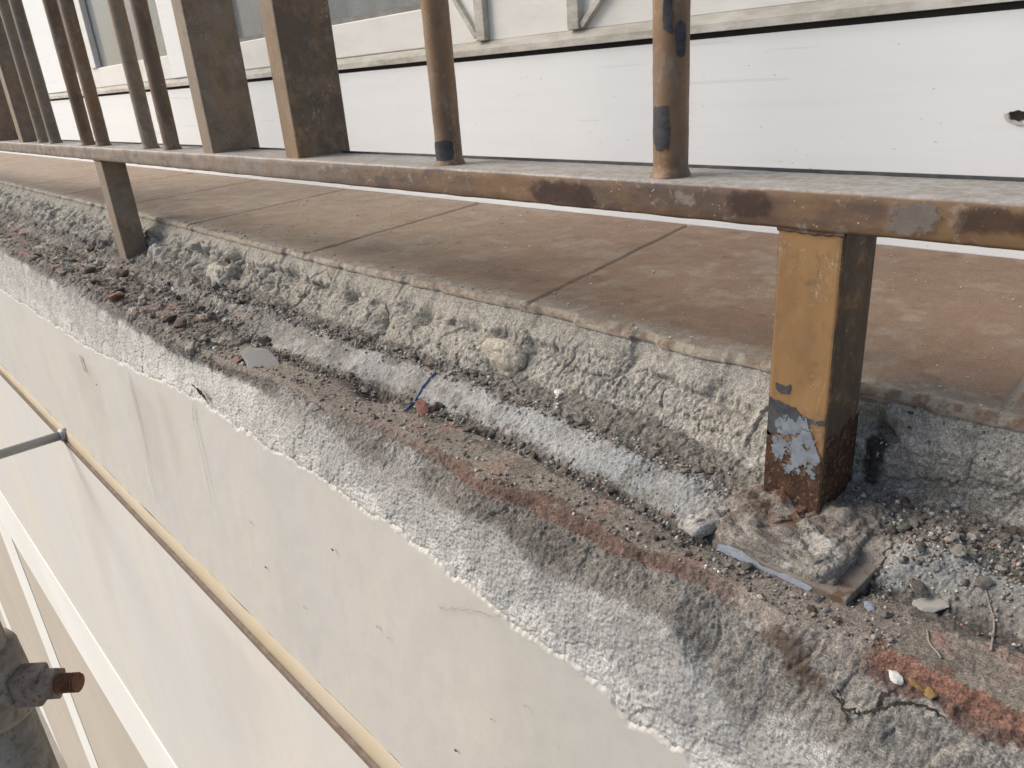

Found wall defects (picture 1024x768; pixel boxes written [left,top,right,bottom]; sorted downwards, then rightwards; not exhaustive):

spalling [0,184,1024,768]
rust [764,412,859,513]
crack [832,689,947,723]